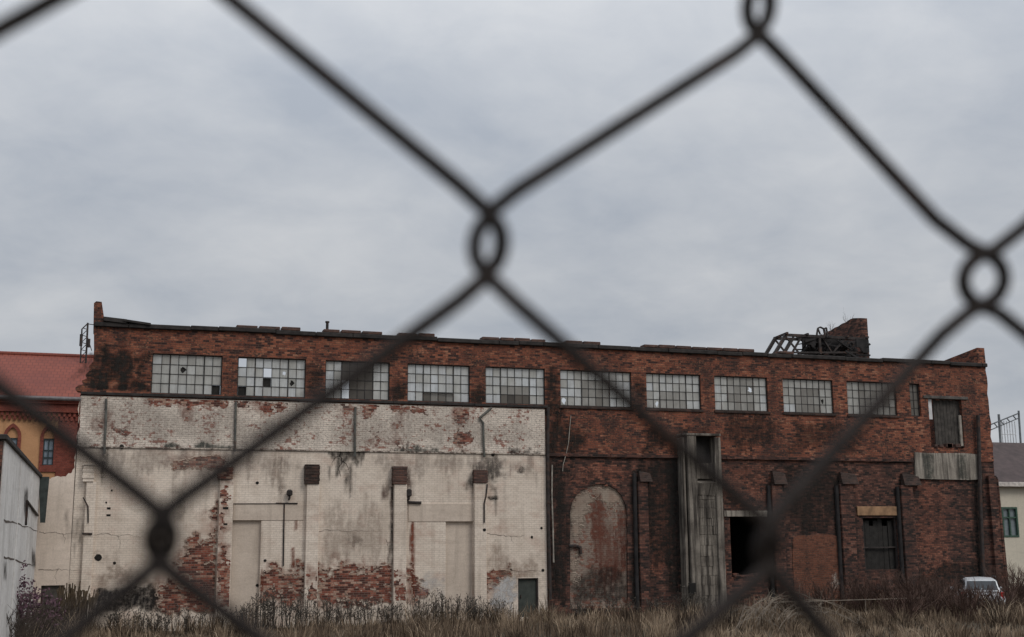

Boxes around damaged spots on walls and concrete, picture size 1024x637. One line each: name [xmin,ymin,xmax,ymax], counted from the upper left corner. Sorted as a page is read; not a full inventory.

flaking render [341,404,428,448]
flaking render [448,408,474,448]
flaking render [170,453,222,471]
water stain [328,451,365,490]
flaking render [570,484,623,537]
flaking render [175,485,231,603]
flaking render [155,581,207,617]
flaking render [256,558,430,613]
flaking render [487,562,513,593]
flaking render [570,550,585,585]